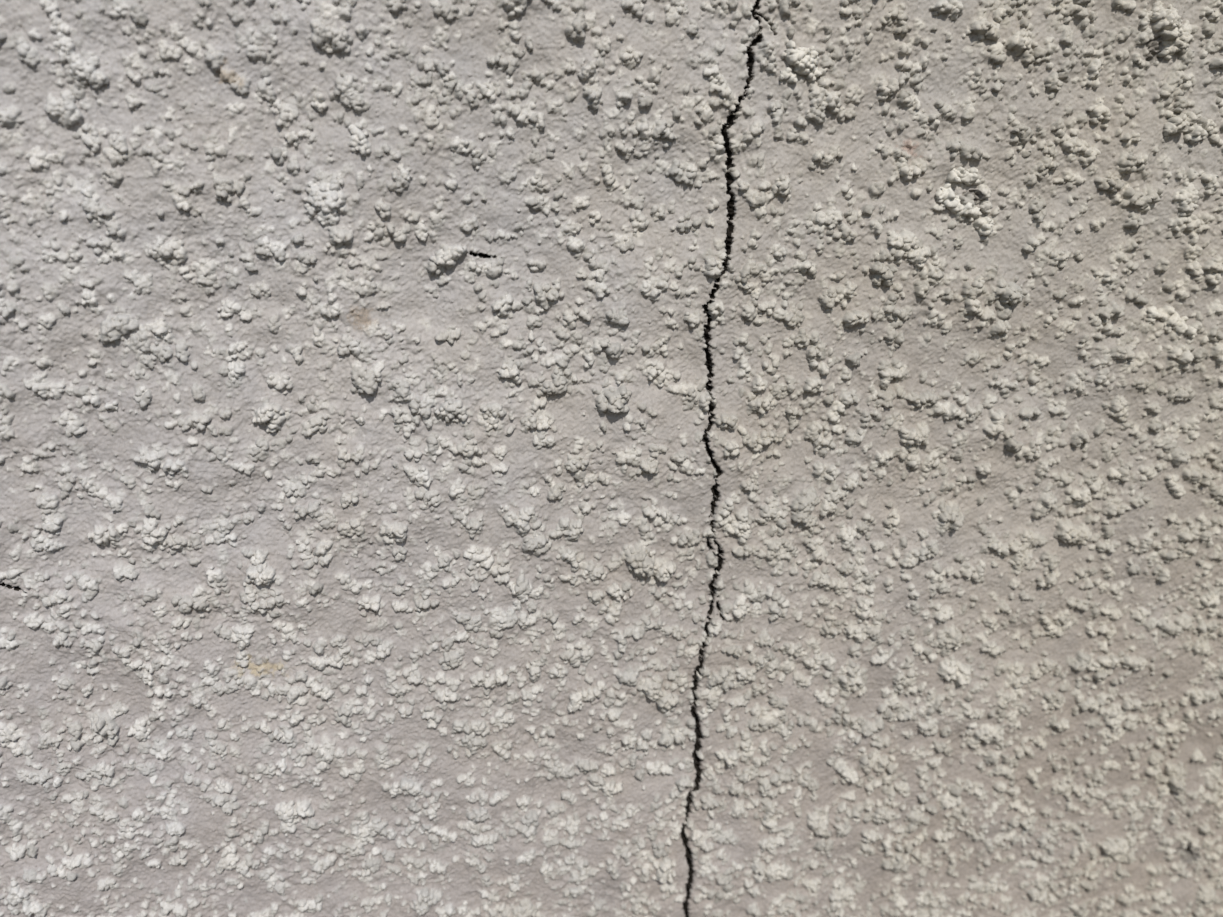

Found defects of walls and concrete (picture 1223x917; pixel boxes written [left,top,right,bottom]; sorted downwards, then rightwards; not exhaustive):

crack [681,0,773,917]